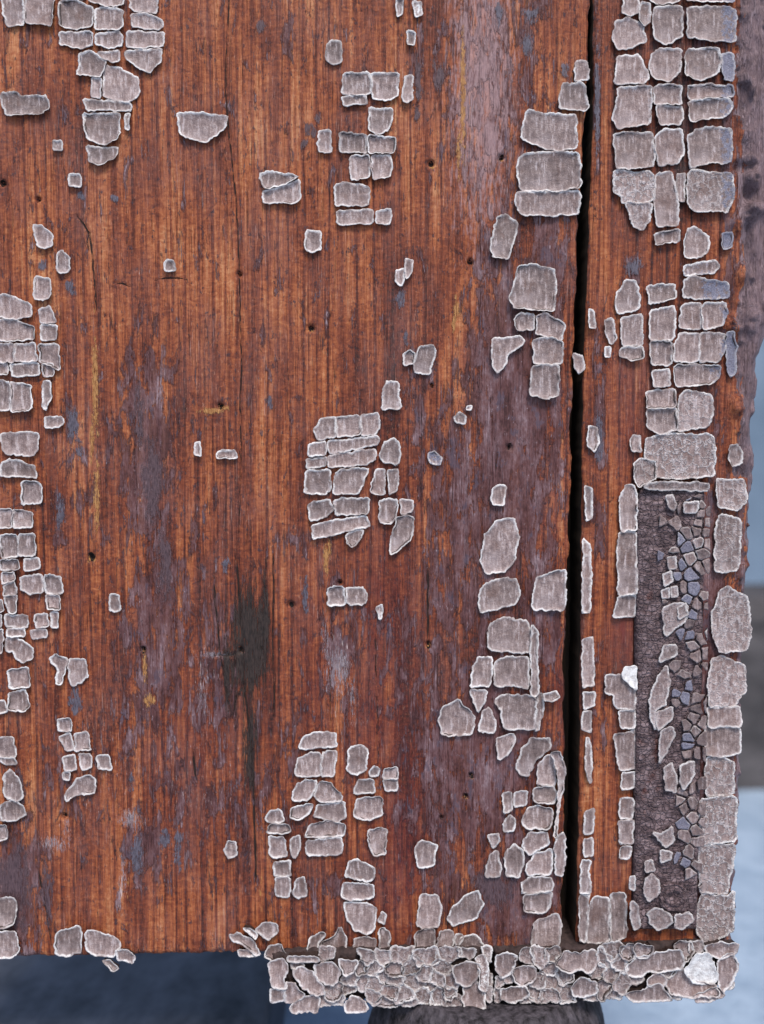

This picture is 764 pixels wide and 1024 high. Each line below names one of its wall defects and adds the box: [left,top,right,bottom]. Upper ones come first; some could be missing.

peeling [0,0,165,165]
peeling [0,224,71,714]
peeling [229,0,753,1015]
peeling [0,736,27,842]
leakage [223,557,271,792]